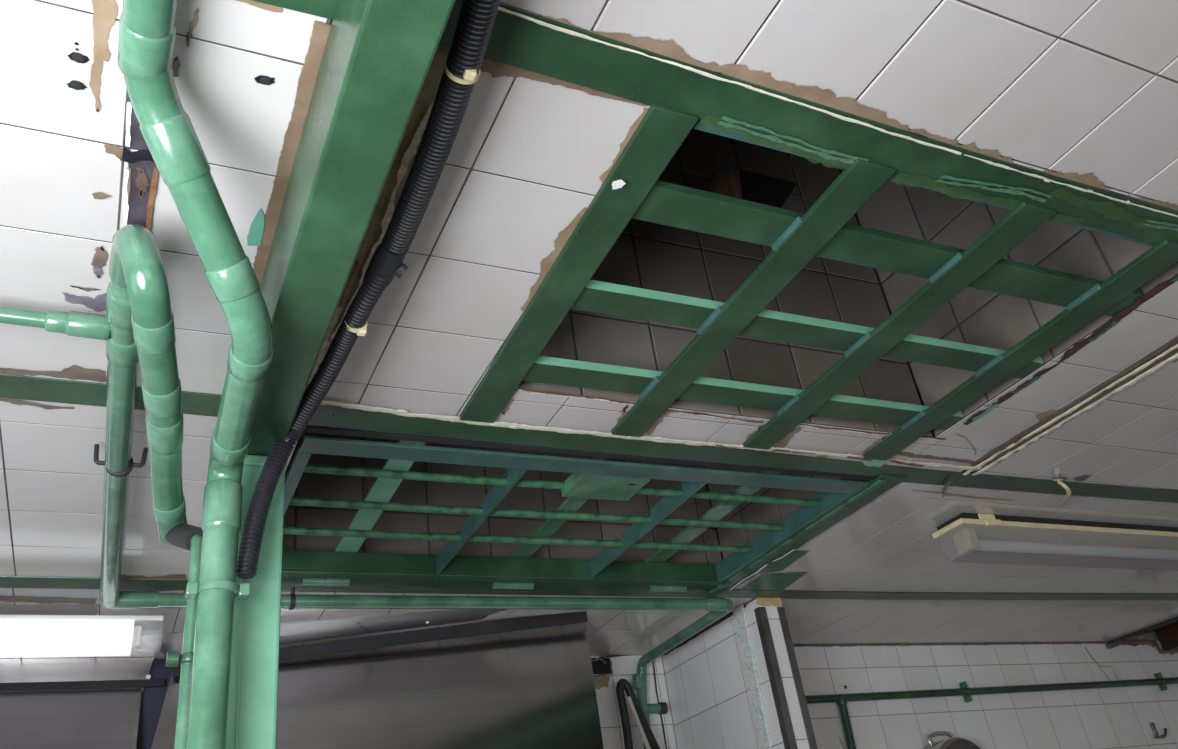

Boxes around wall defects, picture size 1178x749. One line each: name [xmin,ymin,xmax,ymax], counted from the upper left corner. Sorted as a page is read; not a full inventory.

peeling [498,7,1178,239]
peeling [320,344,1178,476]
spalling [963,273,1178,425]
spalling [1105,639,1178,655]